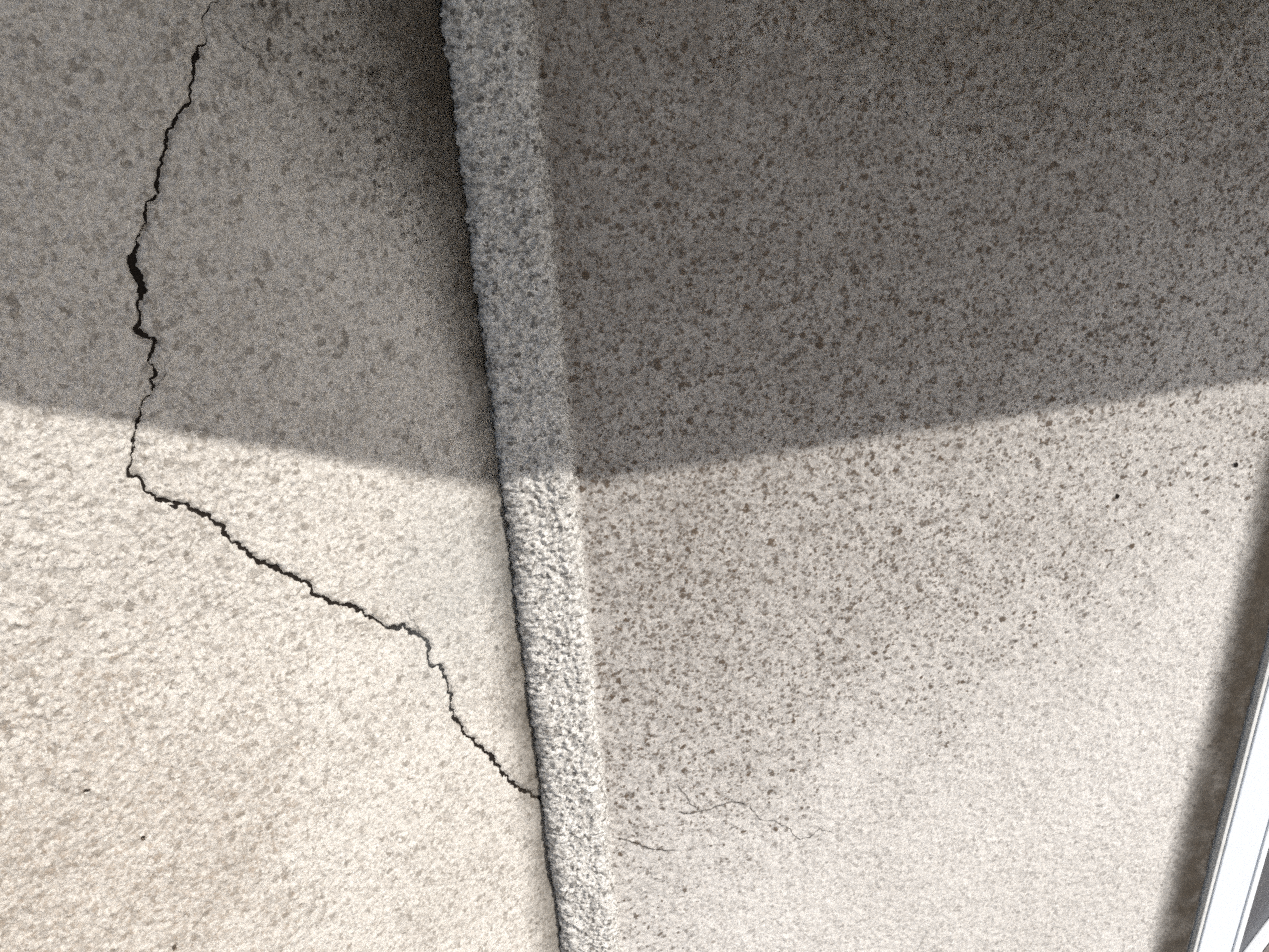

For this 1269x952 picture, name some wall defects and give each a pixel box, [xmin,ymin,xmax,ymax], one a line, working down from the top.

crack [126,0,541,800]